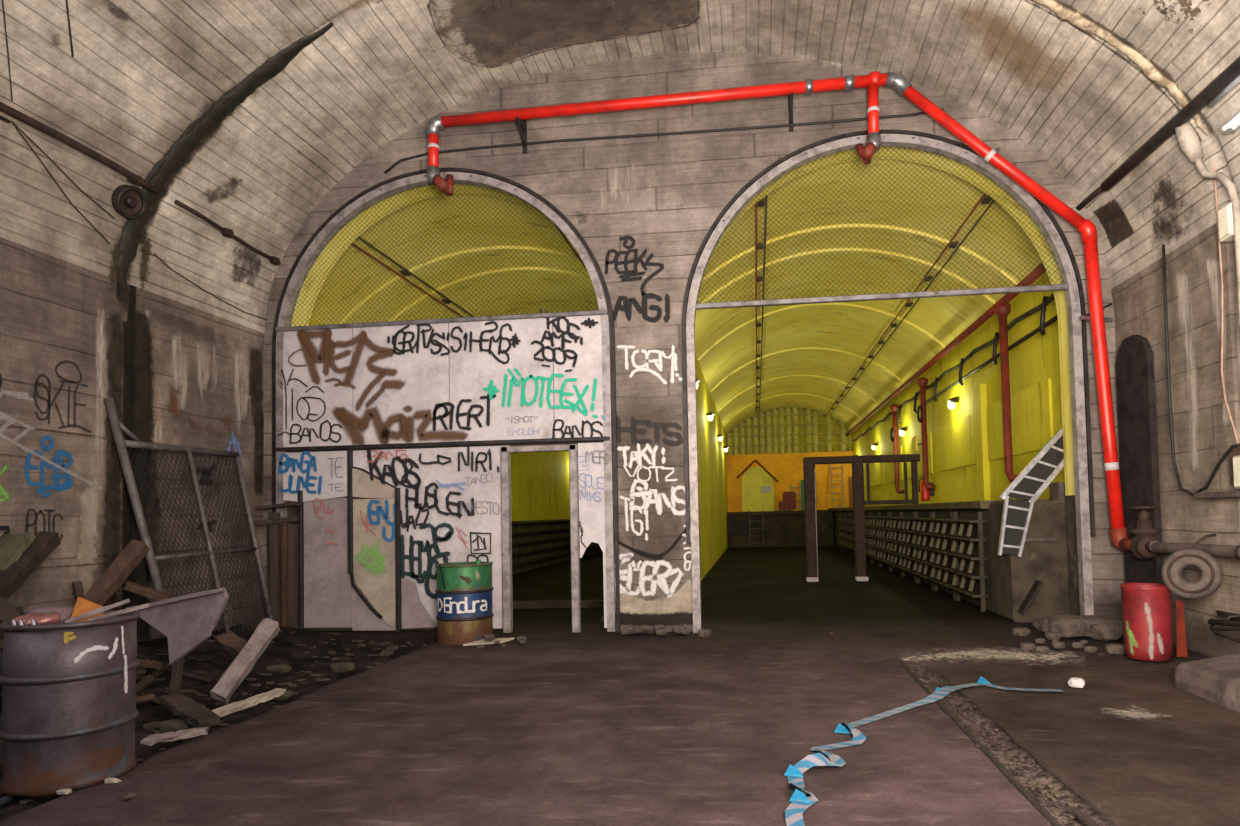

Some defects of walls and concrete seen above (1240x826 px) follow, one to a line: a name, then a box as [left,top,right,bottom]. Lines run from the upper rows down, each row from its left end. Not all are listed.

spalling [427,0,700,68]
peeling [1132,0,1211,48]